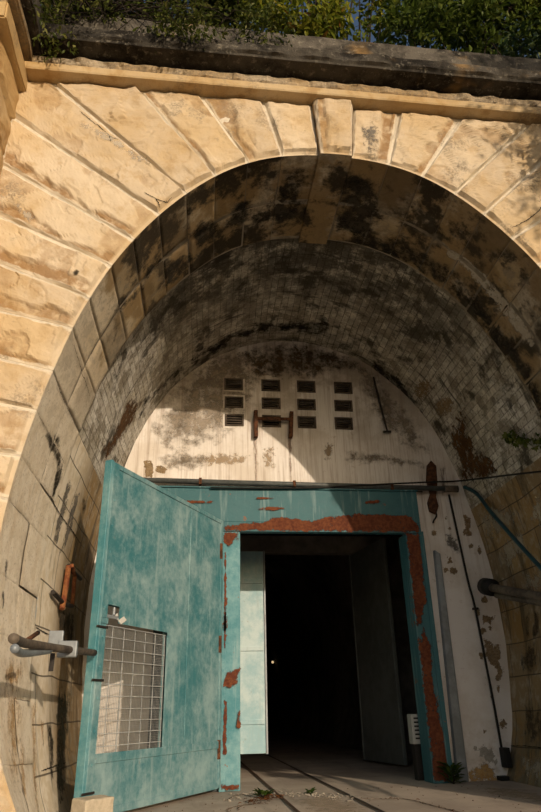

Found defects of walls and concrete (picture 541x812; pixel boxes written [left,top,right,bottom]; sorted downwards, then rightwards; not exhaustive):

leakage [192,167,309,247]
leakage [336,176,541,418]
leakage [46,434,86,548]
leakage [139,321,422,468]
corrosion [451,411,497,482]
corrosion [222,497,449,781]
peeling [477,595,503,700]
crack [363,798,458,812]